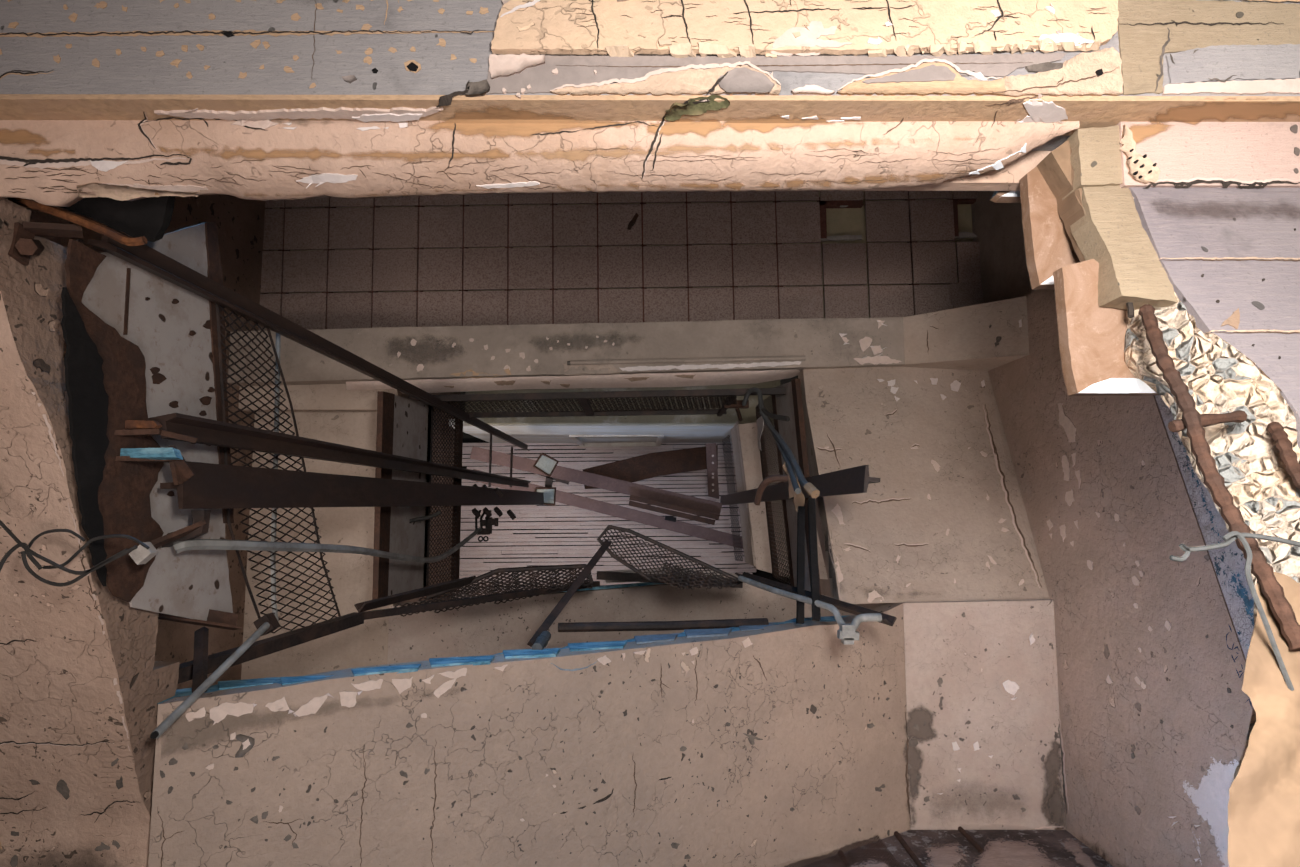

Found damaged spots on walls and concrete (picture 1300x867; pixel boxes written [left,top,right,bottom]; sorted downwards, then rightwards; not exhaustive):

peeling [154,107,443,131]
leakage [159,107,831,162]
peeling [476,181,540,189]
crack [0,0,1115,193]
spalling [437,0,1300,123]
peeling [970,143,1027,174]
crack [1127,20,1284,91]
spalling [1124,292,1300,583]
peeling [186,668,467,777]
leakage [905,707,936,824]
leakage [1042,741,1065,827]
peeling [1183,708,1256,867]